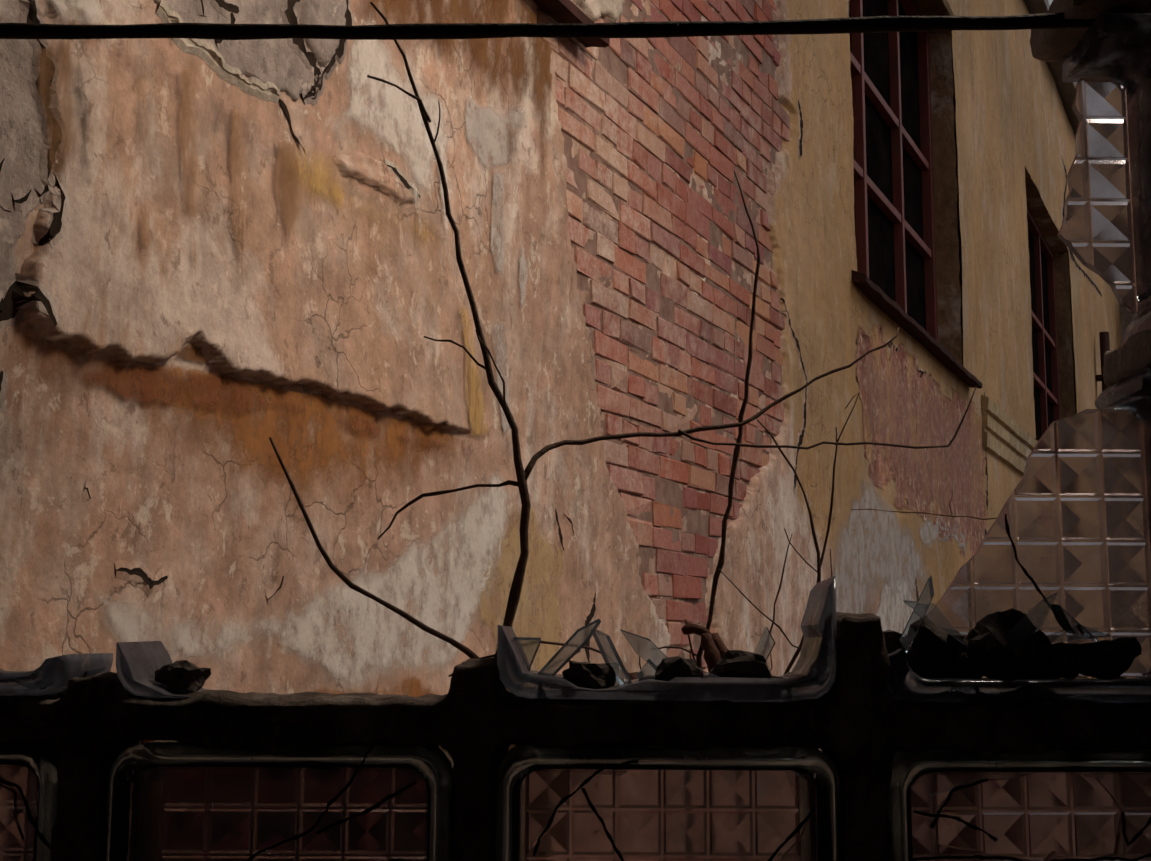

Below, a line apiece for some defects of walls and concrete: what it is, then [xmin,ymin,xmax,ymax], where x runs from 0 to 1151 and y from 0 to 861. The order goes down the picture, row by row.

flaking render [0,0,33,23]
flaking render [154,0,283,24]
flaking render [296,0,347,26]
spalling [571,0,780,23]
flaking render [171,38,341,103]
crack [0,0,70,250]
flaking render [0,39,56,287]
crack [0,273,61,331]
spalling [543,35,790,672]
crack [0,370,8,412]
spalling [834,323,987,634]
spalling [479,507,562,671]